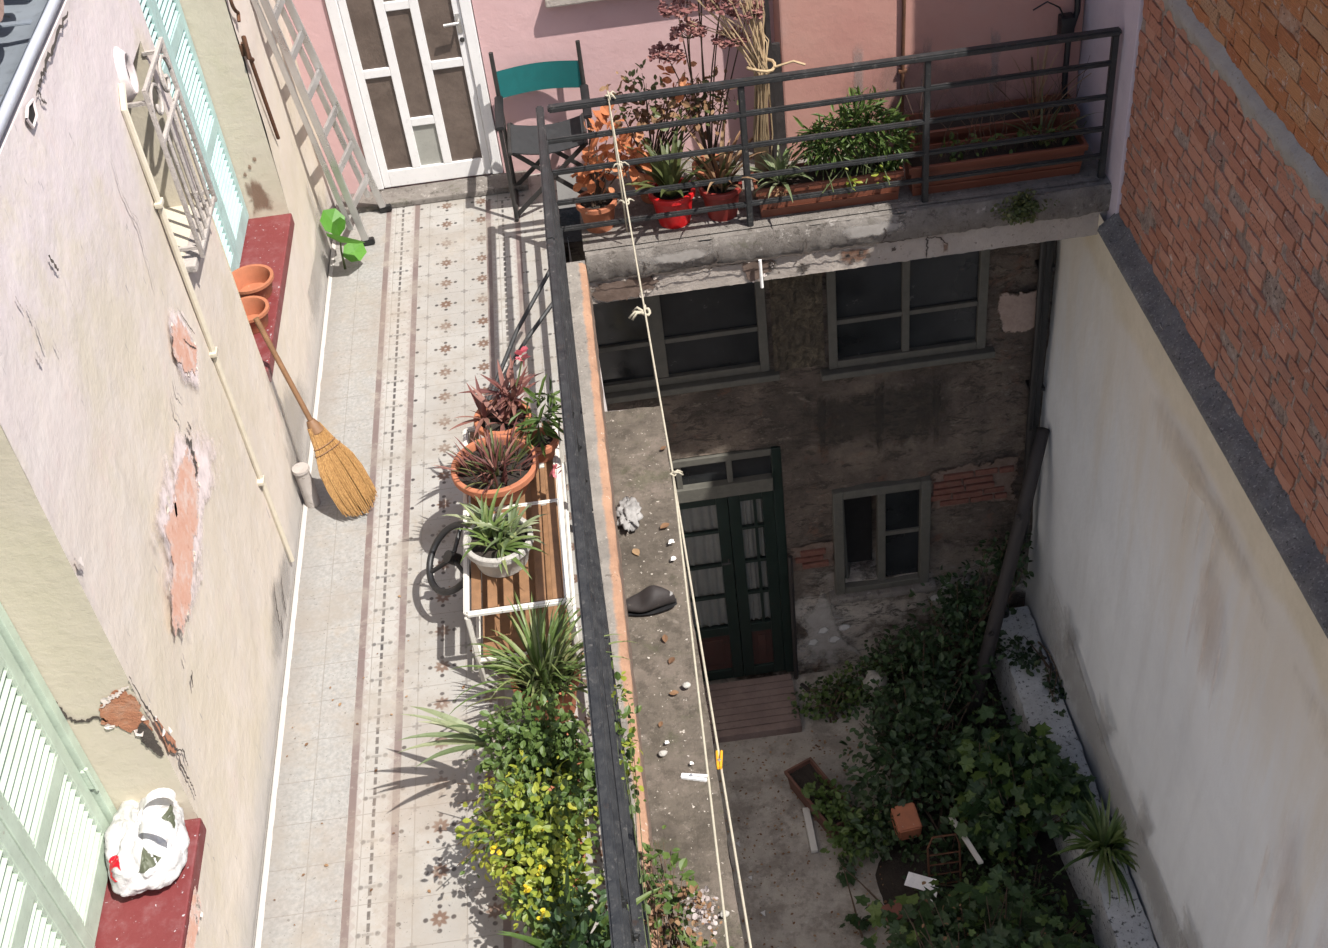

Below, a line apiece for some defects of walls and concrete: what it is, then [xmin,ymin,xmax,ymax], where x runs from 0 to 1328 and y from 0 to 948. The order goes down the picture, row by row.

crack [36,11,68,105]
flaking render [156,311,215,637]
flaking render [55,686,164,757]
crack [129,676,196,796]